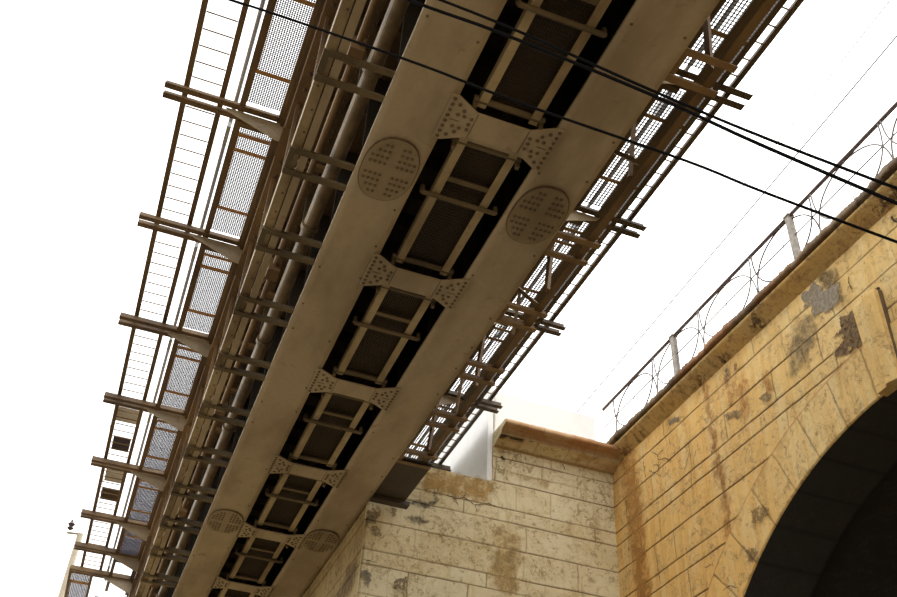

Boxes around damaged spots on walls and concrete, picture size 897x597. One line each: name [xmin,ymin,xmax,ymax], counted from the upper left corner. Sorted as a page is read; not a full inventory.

peeling [801,282,839,315]
spalling [832,311,862,357]
corrosion [621,448,651,597]
corrosion [712,435,730,530]